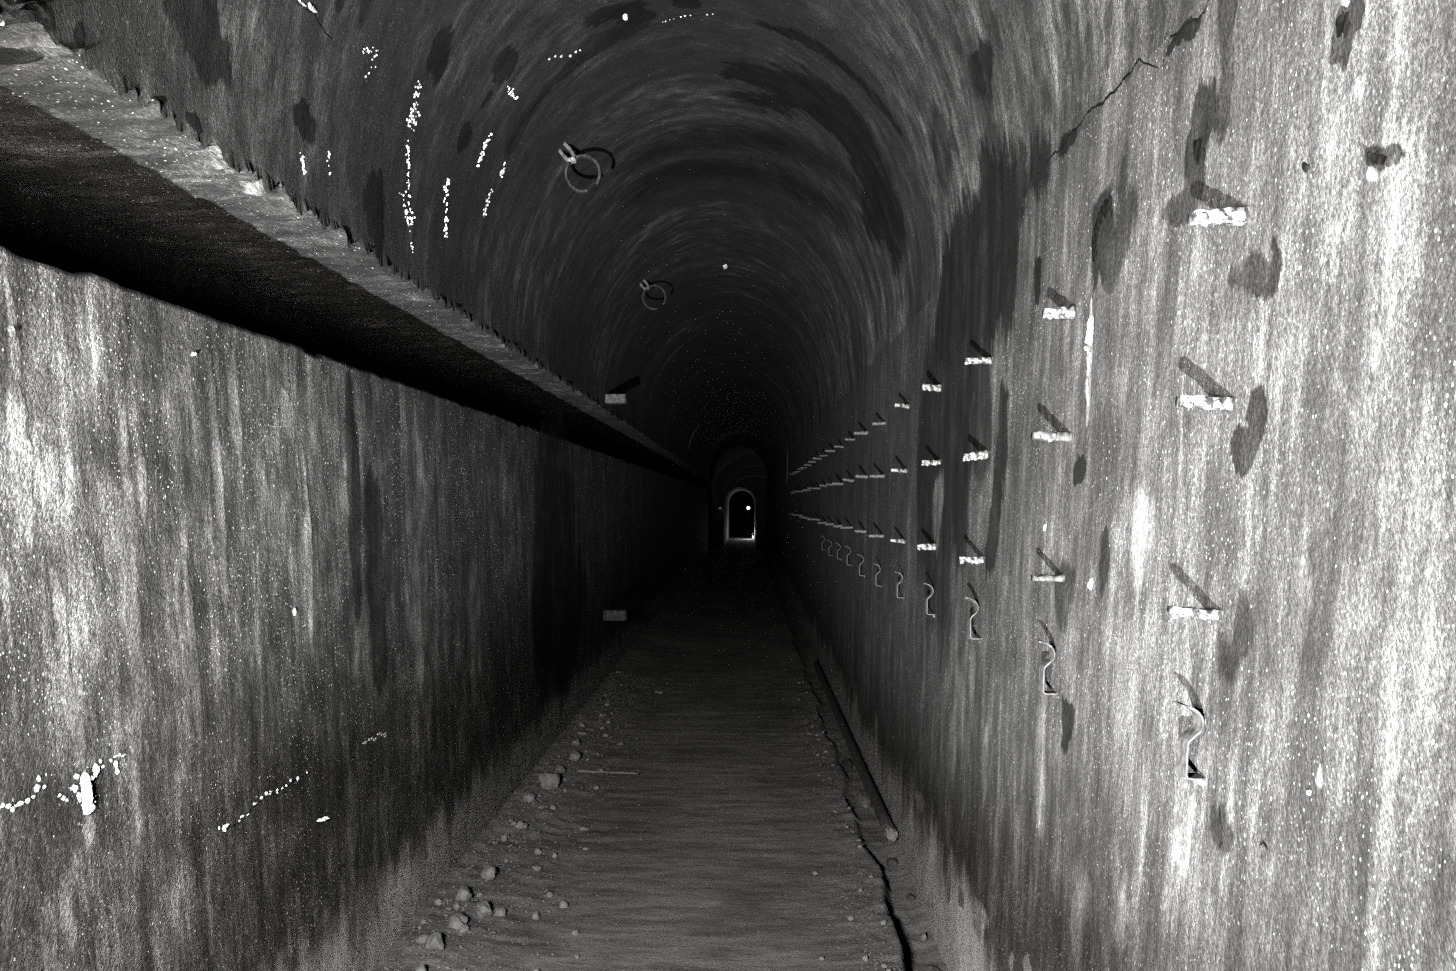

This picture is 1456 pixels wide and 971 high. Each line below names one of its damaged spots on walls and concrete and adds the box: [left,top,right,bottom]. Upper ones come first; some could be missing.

leakage [0,381,148,971]